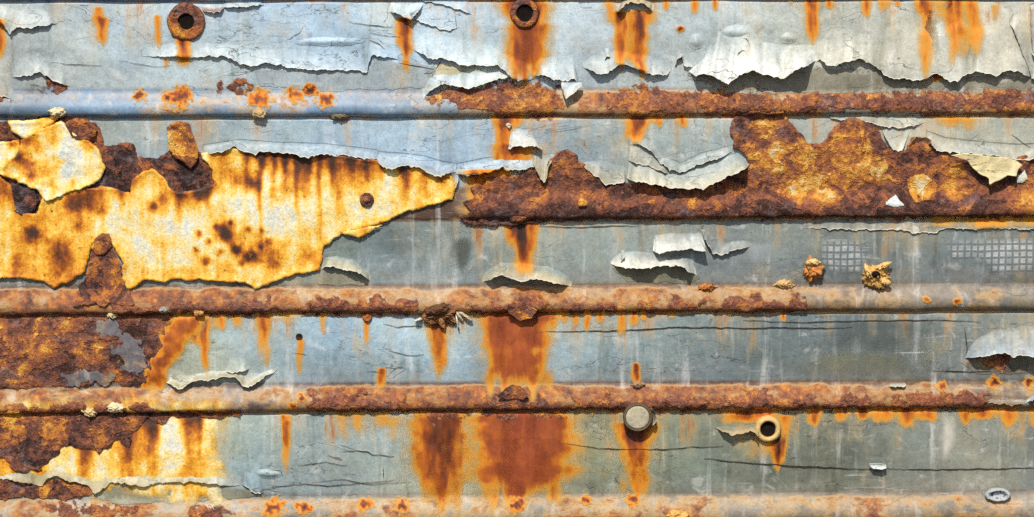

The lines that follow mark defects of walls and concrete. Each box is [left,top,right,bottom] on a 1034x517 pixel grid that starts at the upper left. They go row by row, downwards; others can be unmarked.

peeling [141,0,1034,99]
rust [0,116,73,145]
rust [83,122,214,192]
peeling [584,136,749,190]
rust [426,0,1034,275]
rust [0,175,42,214]
peeling [610,227,752,275]
peeling [964,325,1034,359]
rust [0,294,419,517]
rust [280,292,1034,516]
peeling [988,396,1034,406]